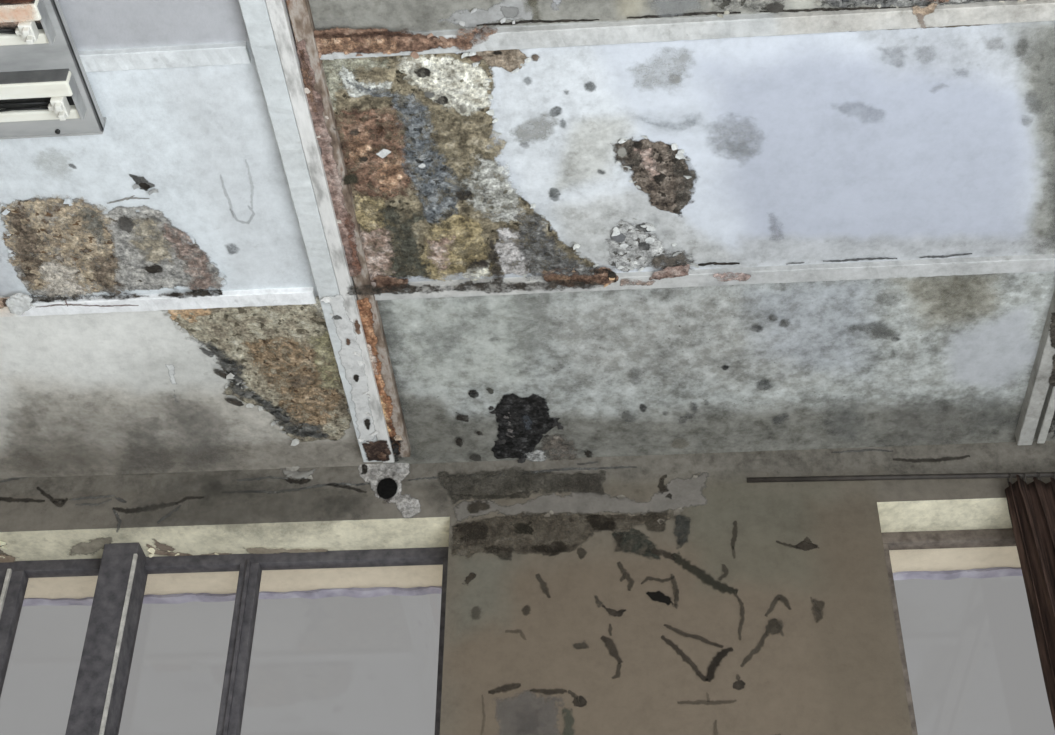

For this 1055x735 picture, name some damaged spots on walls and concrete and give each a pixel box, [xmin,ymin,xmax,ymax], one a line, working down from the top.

spalling [815,0,974,9]
corrosion [912,3,937,28]
spalling [0,49,699,446]
corrosion [293,25,497,462]
leakage [752,316,789,332]
leakage [849,324,900,341]
spalling [456,388,592,463]
crack [0,476,370,532]
peeling [453,472,709,522]
crack [651,521,745,640]
crack [601,624,623,679]
crack [488,683,580,703]